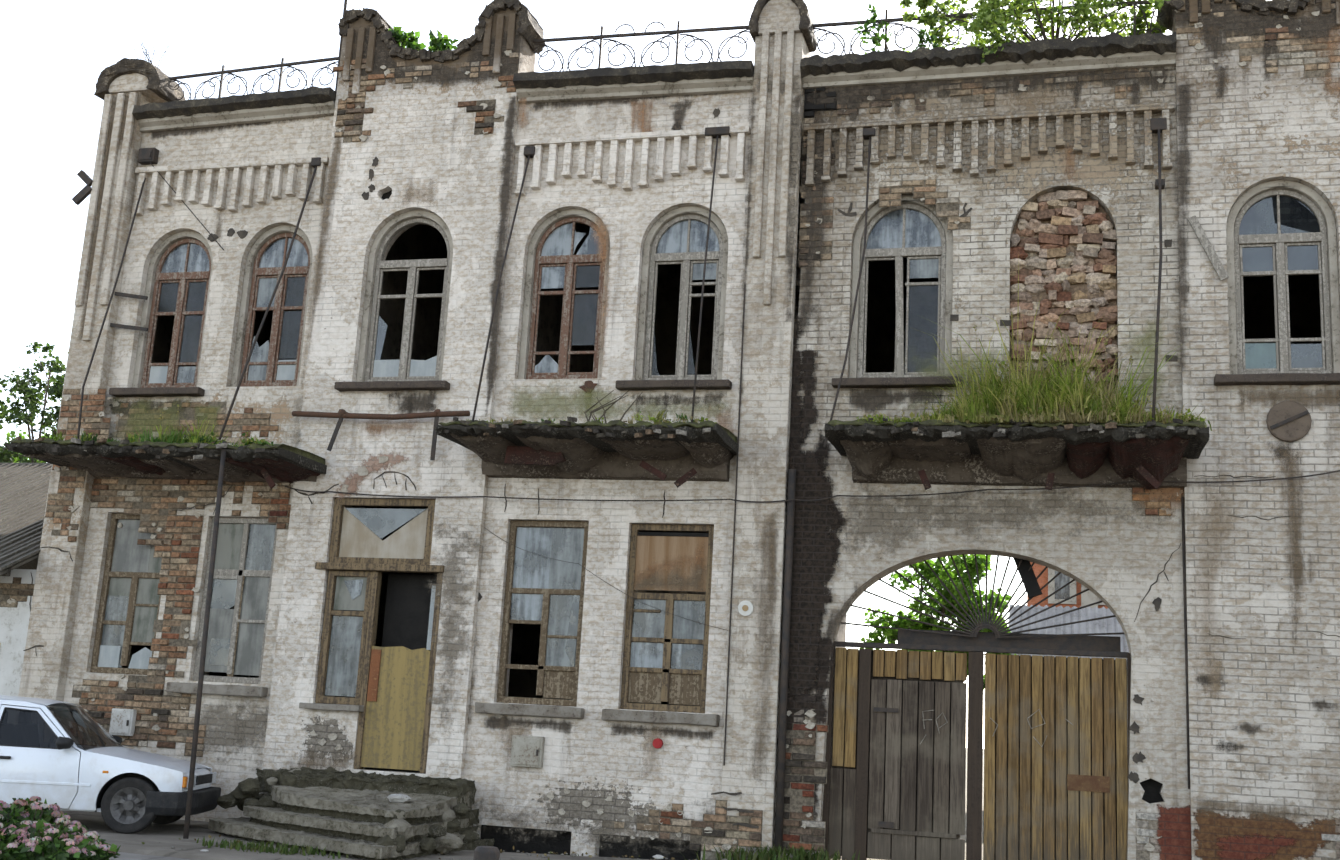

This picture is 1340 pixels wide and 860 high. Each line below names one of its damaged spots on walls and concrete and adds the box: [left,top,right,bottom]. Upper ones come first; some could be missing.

spalling [333,56,443,143]
spalling [457,50,519,135]
spalling [798,0,1340,267]
damp [799,350,831,470]
spalling [7,388,293,757]
damp [811,590,859,724]
spalling [582,667,831,856]